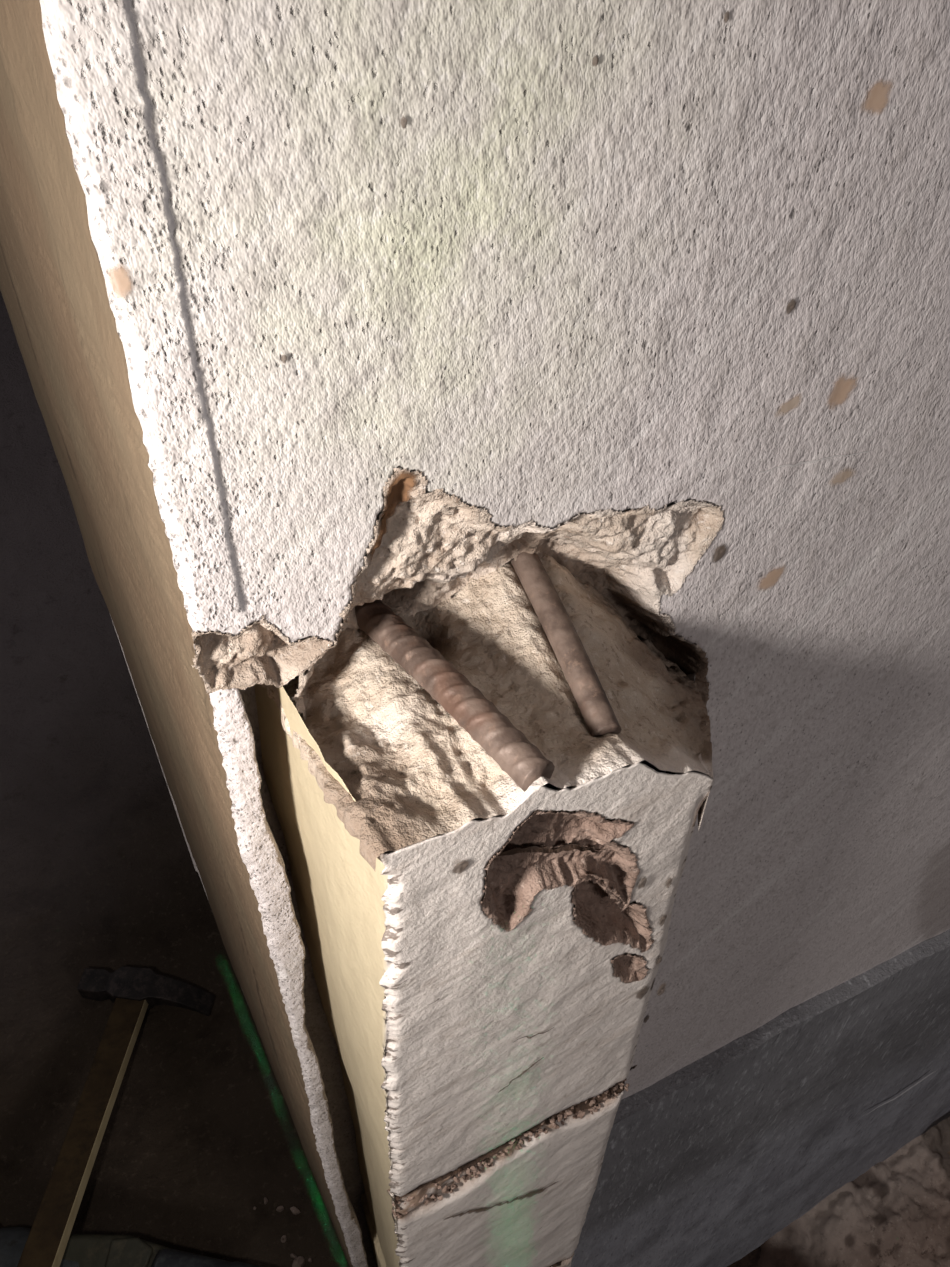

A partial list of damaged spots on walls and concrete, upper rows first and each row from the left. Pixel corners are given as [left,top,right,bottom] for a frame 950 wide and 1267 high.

rust [371,472,416,560]
spalling [191,468,726,792]
spalling [452,861,469,874]
spalling [480,809,667,999]
crack [392,1065,637,1220]